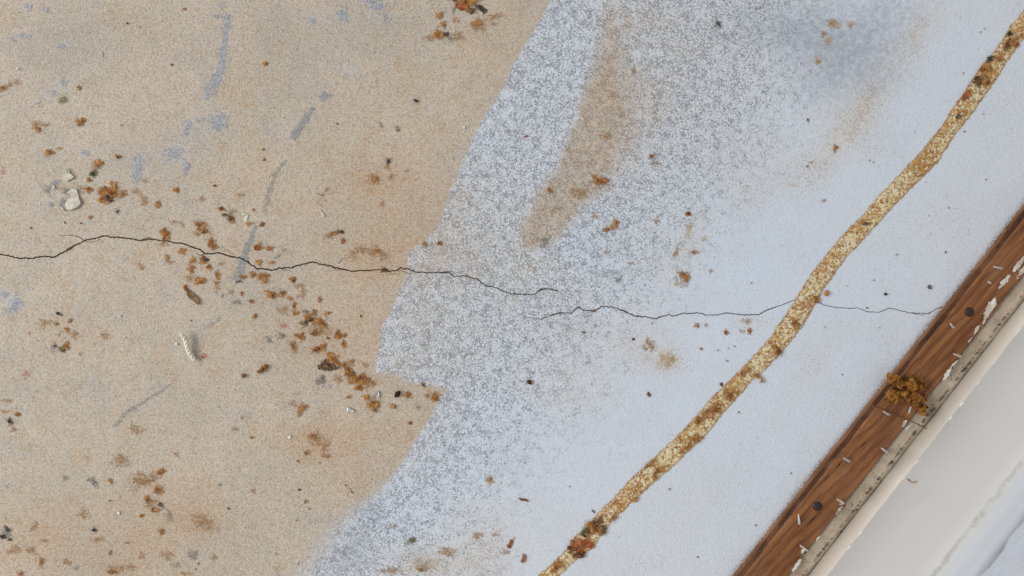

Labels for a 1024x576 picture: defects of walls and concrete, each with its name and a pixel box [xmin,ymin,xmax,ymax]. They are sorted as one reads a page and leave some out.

corrosion [979,35,1020,86]
peeling [50,169,81,211]
corrosion [571,172,609,198]
crack [0,235,794,320]
corrosion [673,249,691,286]
crack [821,303,942,316]
corrosion [679,366,765,454]
corrosion [641,458,668,481]
corrosion [550,513,618,573]